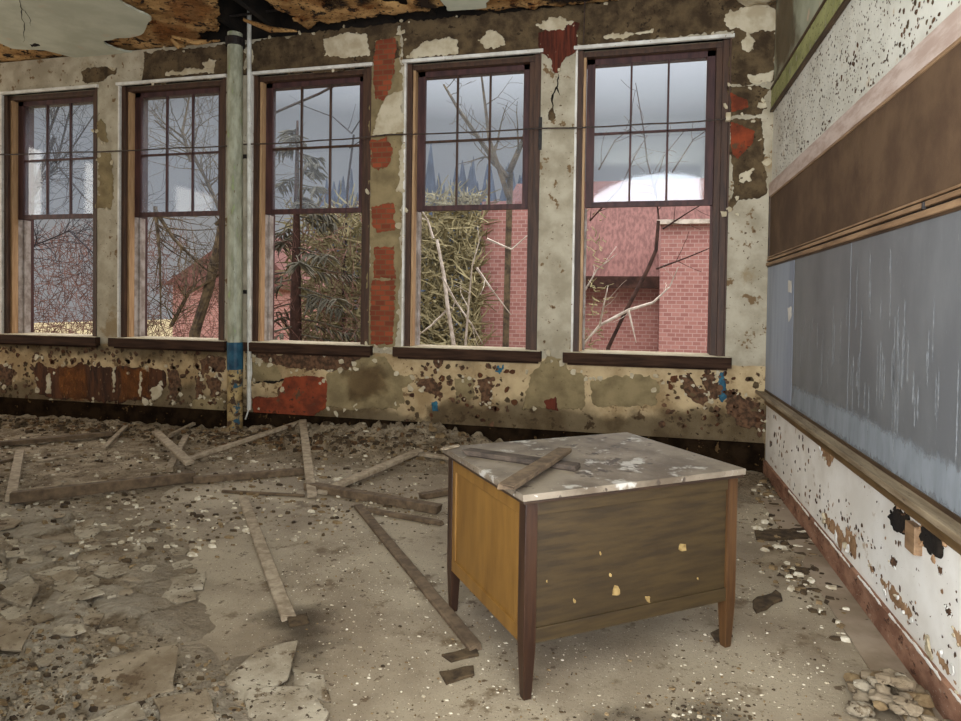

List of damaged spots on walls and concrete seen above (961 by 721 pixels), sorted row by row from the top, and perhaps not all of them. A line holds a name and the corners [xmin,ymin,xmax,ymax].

peeling [163,35,220,52]
peeling [0,345,226,410]
flaking render [243,0,961,704]